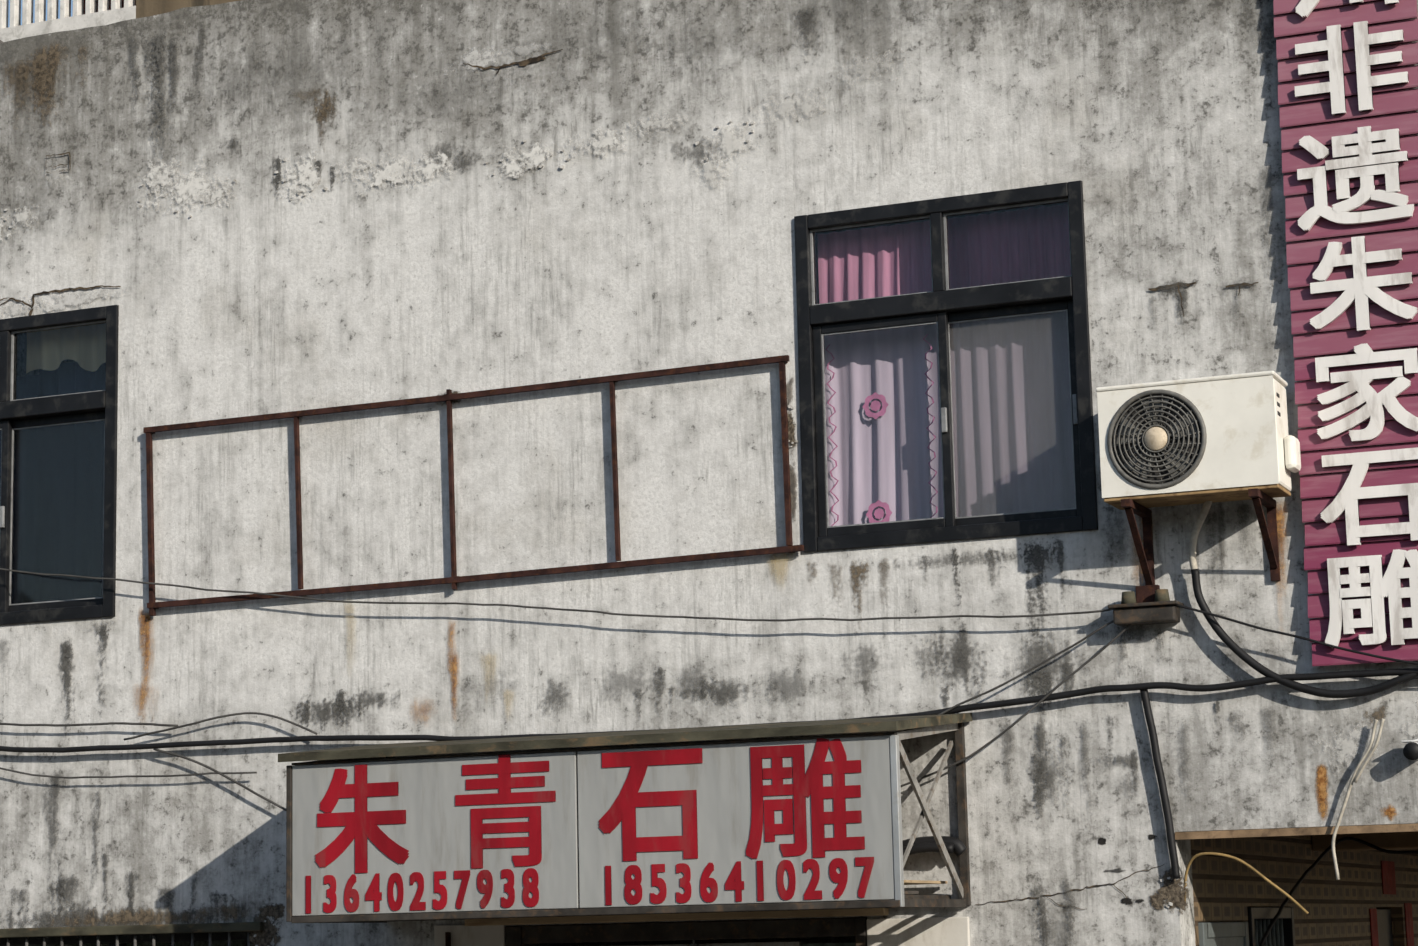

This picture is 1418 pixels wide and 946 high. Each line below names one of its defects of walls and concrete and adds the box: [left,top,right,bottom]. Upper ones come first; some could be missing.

peeling [463,46,536,70]
peeling [138,158,237,218]
peeling [275,151,454,203]
crack [0,285,121,316]
leakage [850,561,887,610]
leakage [925,548,1005,606]
corrosion [139,614,151,704]
corrosion [449,623,458,702]
leakage [934,624,987,706]
leakage [1007,540,1137,816]
leakage [296,690,400,726]
corrosion [1317,766,1327,818]